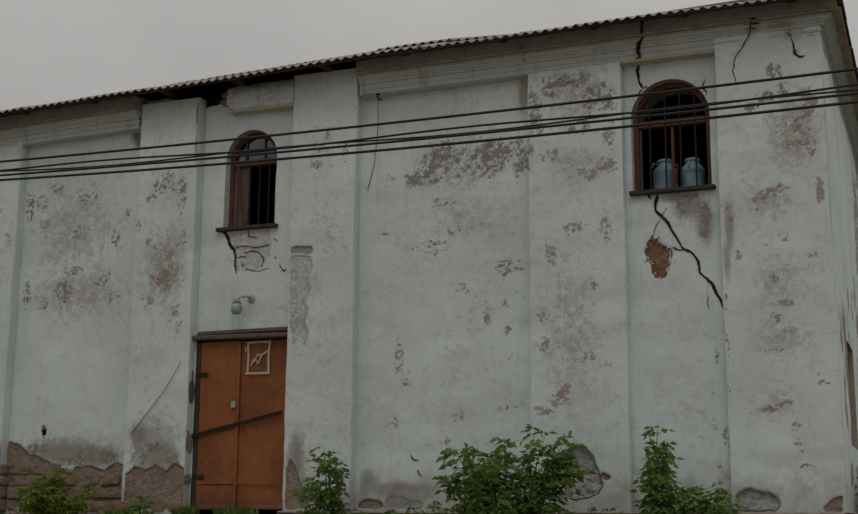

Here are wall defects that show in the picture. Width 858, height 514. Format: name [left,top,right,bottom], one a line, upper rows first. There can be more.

crack [634,20,648,124]
crack [732,17,761,82]
crack [784,31,805,58]
flaking render [529,72,618,181]
flaking render [385,136,558,190]
crack [222,230,286,274]
spalling [644,235,672,278]
crack [647,194,723,309]
flaking render [289,245,313,345]
flaking render [0,426,193,514]
spalling [554,446,611,500]
spalling [735,488,780,511]